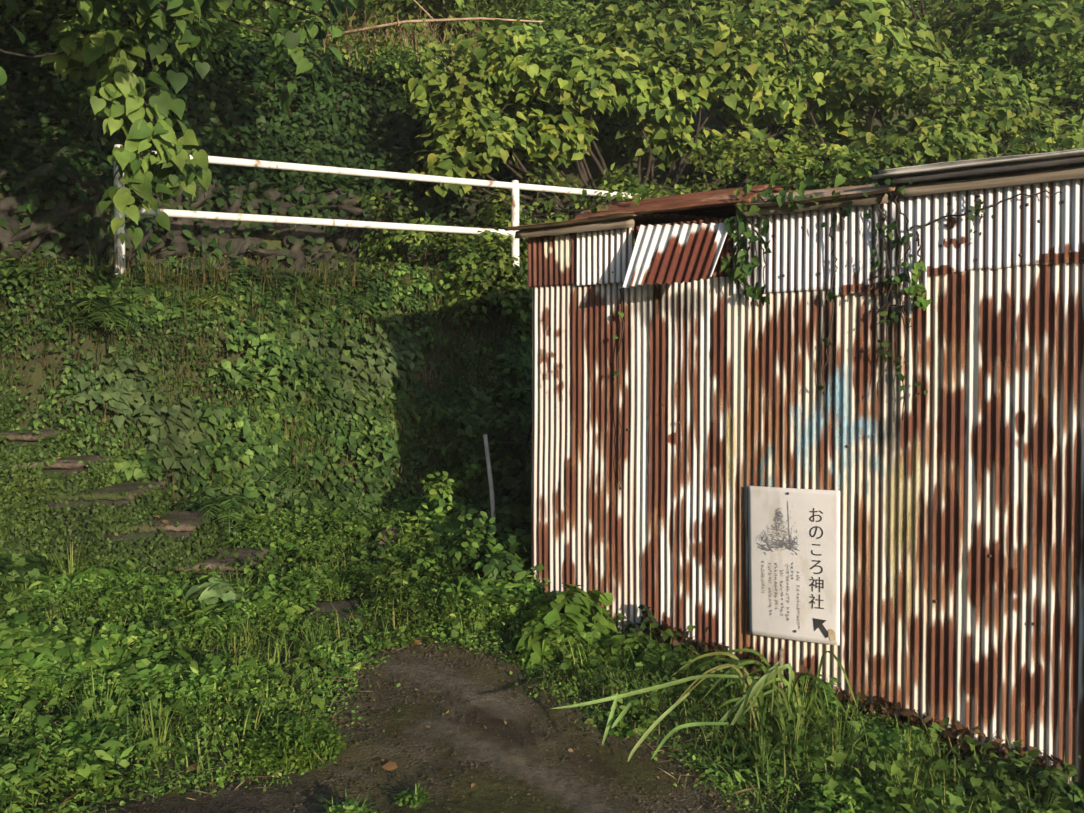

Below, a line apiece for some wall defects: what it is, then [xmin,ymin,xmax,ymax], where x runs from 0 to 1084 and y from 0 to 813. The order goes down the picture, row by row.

rust [537,226,1084,784]
rust [943,217,972,248]